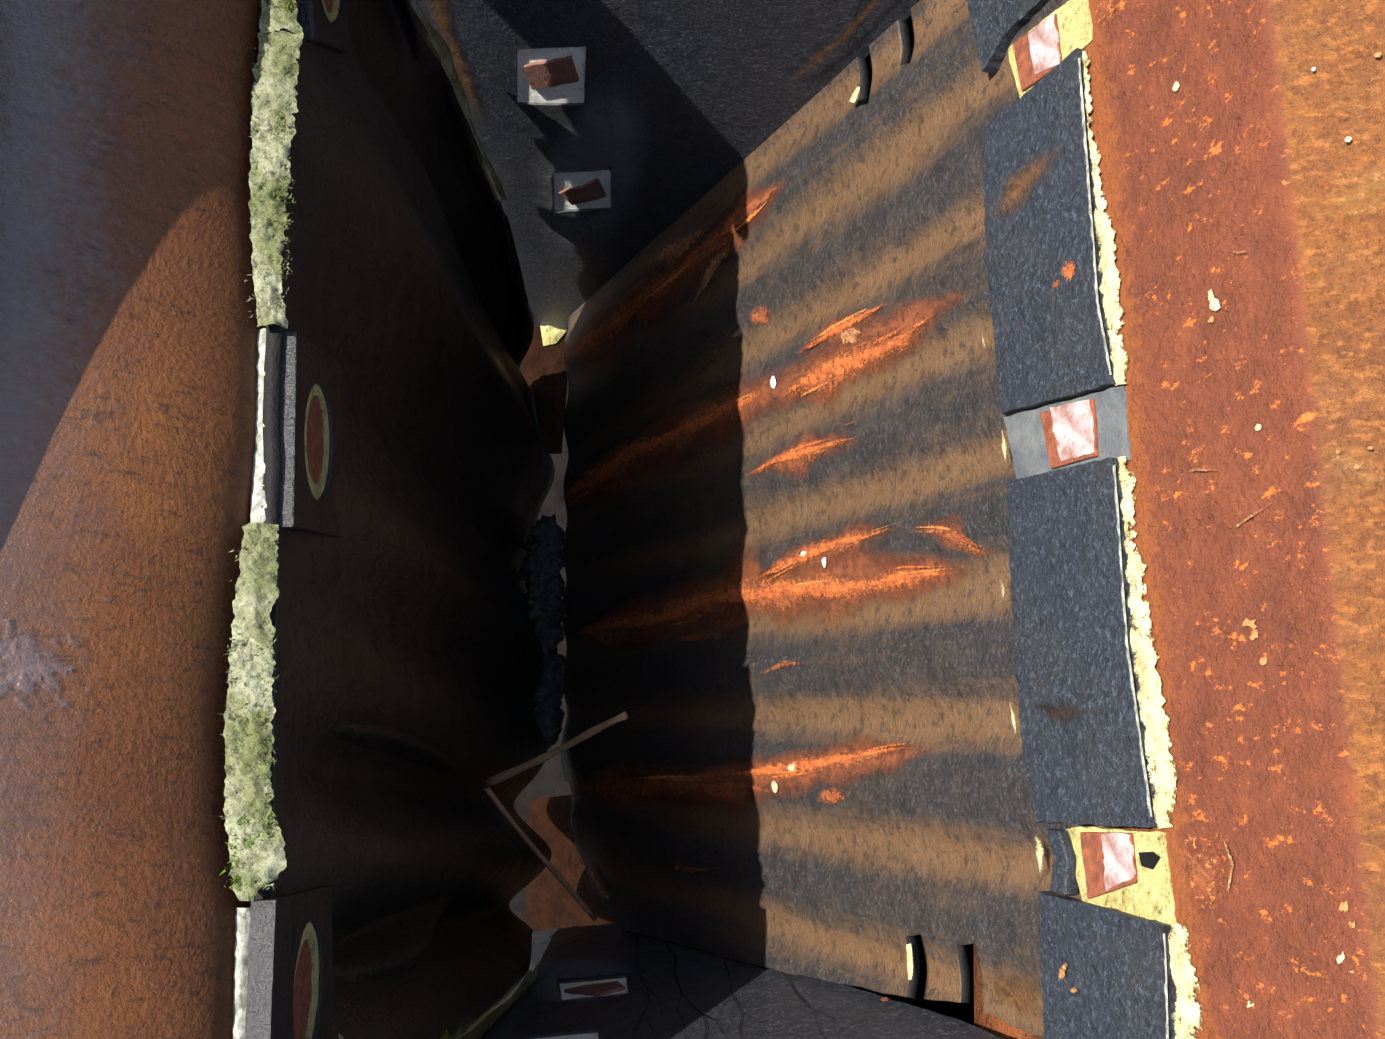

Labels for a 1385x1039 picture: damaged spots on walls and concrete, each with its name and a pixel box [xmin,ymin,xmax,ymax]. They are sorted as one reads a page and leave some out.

rust [523,188,776,454]
rust [562,297,954,502]
rust [580,522,984,647]
rust [525,739,914,931]